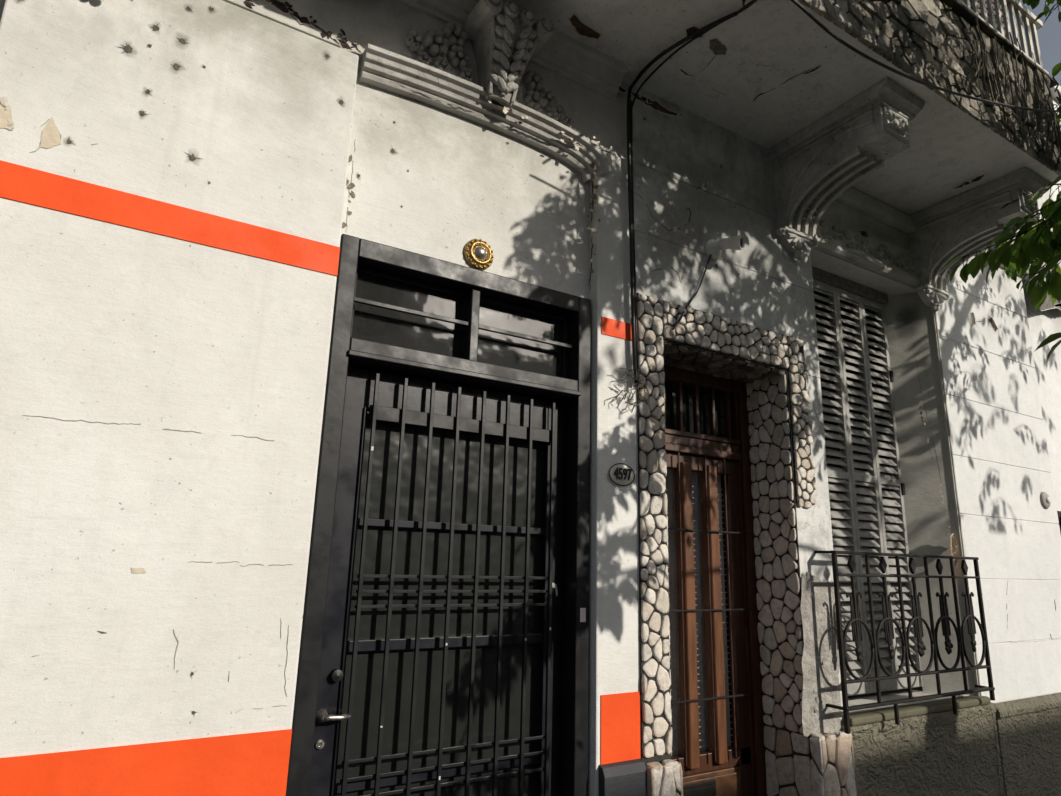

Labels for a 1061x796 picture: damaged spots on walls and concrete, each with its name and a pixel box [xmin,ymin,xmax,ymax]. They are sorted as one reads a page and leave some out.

flaking render [244,0,363,52]
spalling [568,13,602,50]
spalling [680,25,728,98]
peeling [0,96,14,130]
peeling [30,117,62,153]
crack [24,415,136,425]